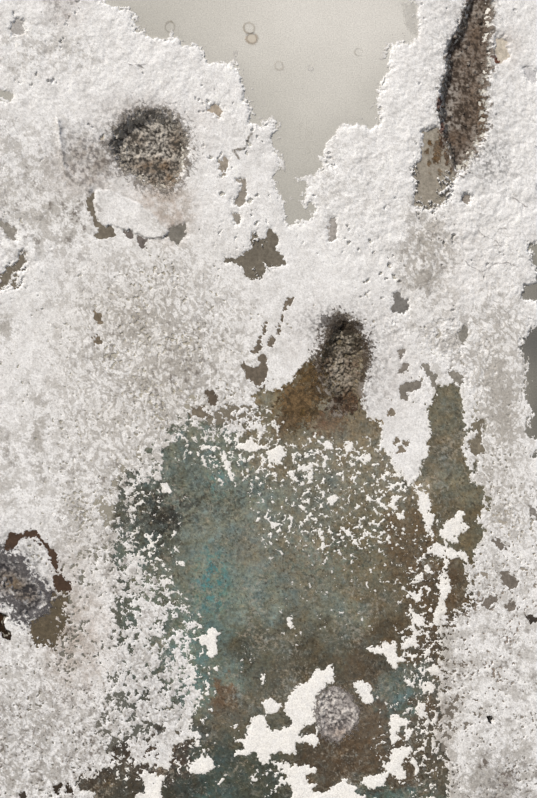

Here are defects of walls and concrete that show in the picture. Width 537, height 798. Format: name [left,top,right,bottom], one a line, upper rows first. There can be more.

leakage [0,0,287,798]
corrosion [272,361,363,436]
leakage [217,0,537,798]